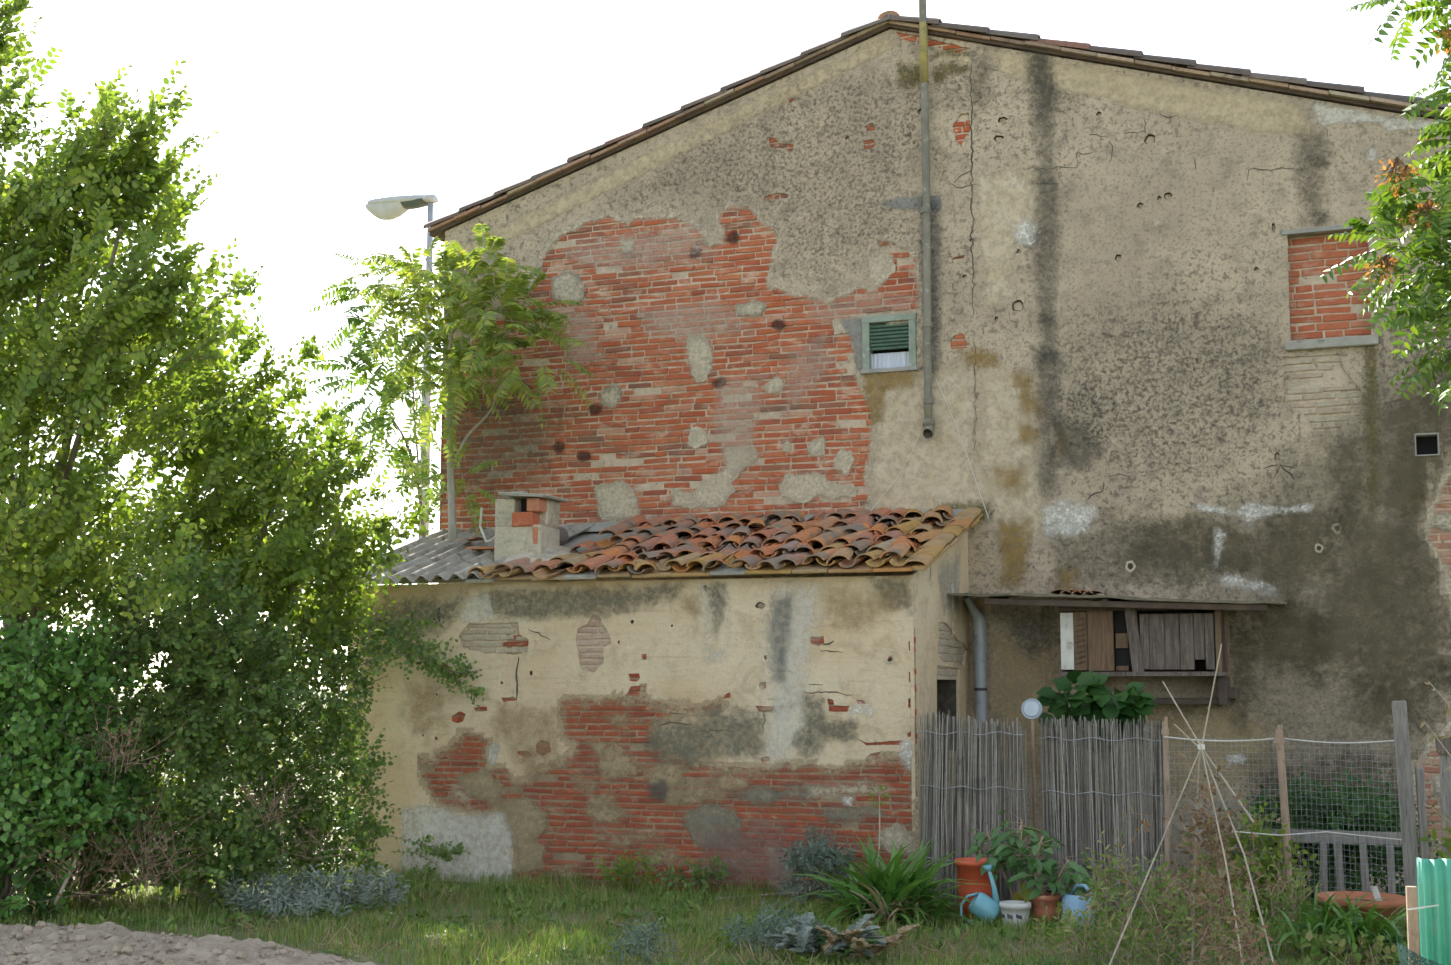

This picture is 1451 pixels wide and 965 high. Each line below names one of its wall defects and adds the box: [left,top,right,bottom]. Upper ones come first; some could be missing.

spalling [953,114,970,145]
crack [950,59,1187,454]
flaking render [440,193,923,551]
spalling [460,622,529,655]
spalling [576,615,620,673]
leakage [767,584,815,758]
spalling [937,622,966,680]
efflorescence [1042,501,1095,535]
leakage [1130,329,1451,823]
flaking render [1423,463,1451,595]
flaking render [417,628,919,897]
flaking render [1412,721,1451,846]